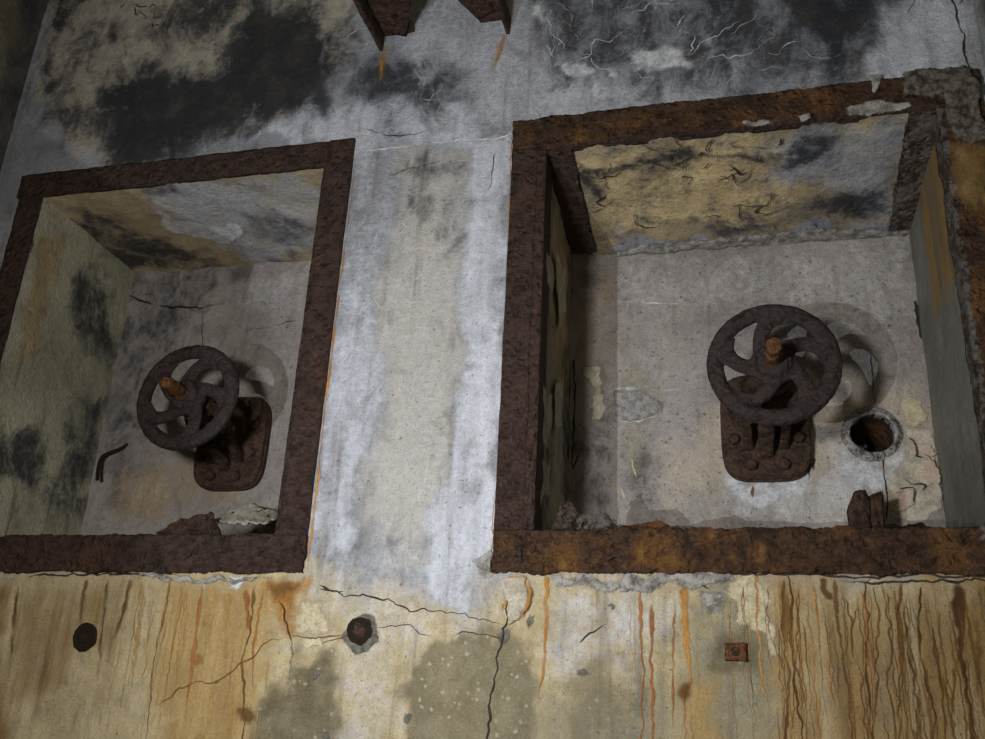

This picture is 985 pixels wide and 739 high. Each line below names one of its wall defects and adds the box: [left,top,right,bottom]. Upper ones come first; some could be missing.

crack [951,0,969,69]
spalling [847,65,985,144]
peeling [543,378,563,448]
peeling [887,396,944,521]
corrosion [156,512,222,535]
corrosion [118,579,310,739]
crack [161,601,347,703]
water stain [249,651,340,739]
crack [320,547,529,739]
water stain [403,628,535,739]
corrosion [634,593,655,739]
corrosion [728,576,984,739]